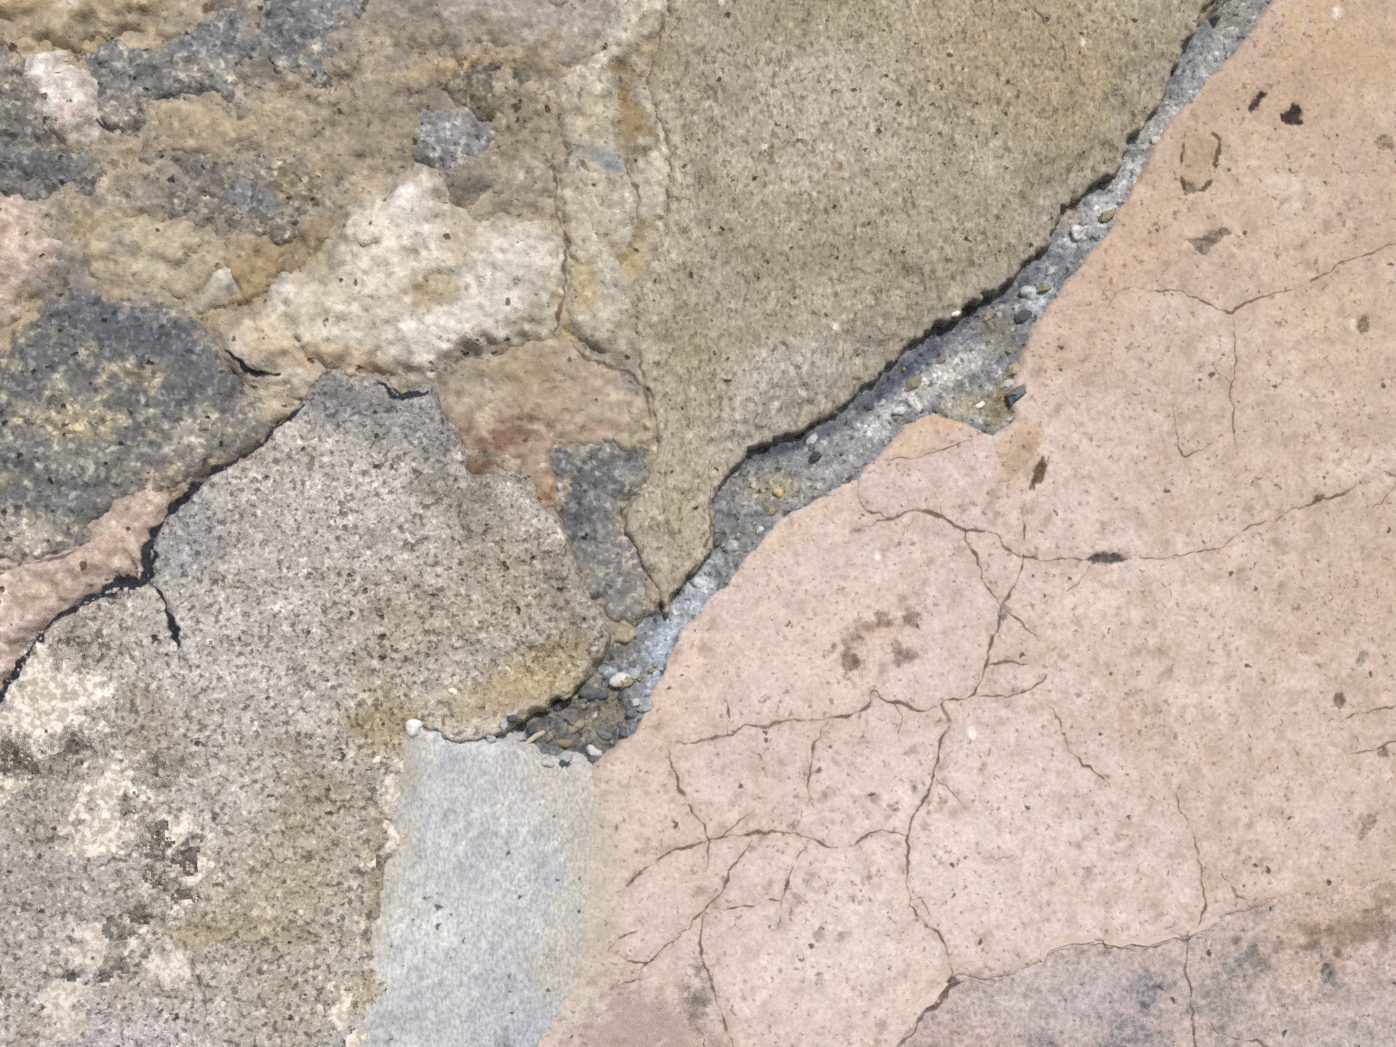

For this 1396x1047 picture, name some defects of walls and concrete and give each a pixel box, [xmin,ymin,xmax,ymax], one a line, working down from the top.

crack [225,349,281,377]
crack [376,380,429,400]
crack [552,152,651,418]
crack [1105,218,1396,457]
crack [0,404,306,703]
crack [1139,473,1395,559]
crack [608,479,1110,1047]
peeling [1334,693,1346,707]
peeling [1359,814,1377,840]
crack [1342,707,1396,754]
peeling [881,873,1396,1047]
crack [1176,793,1277,1047]